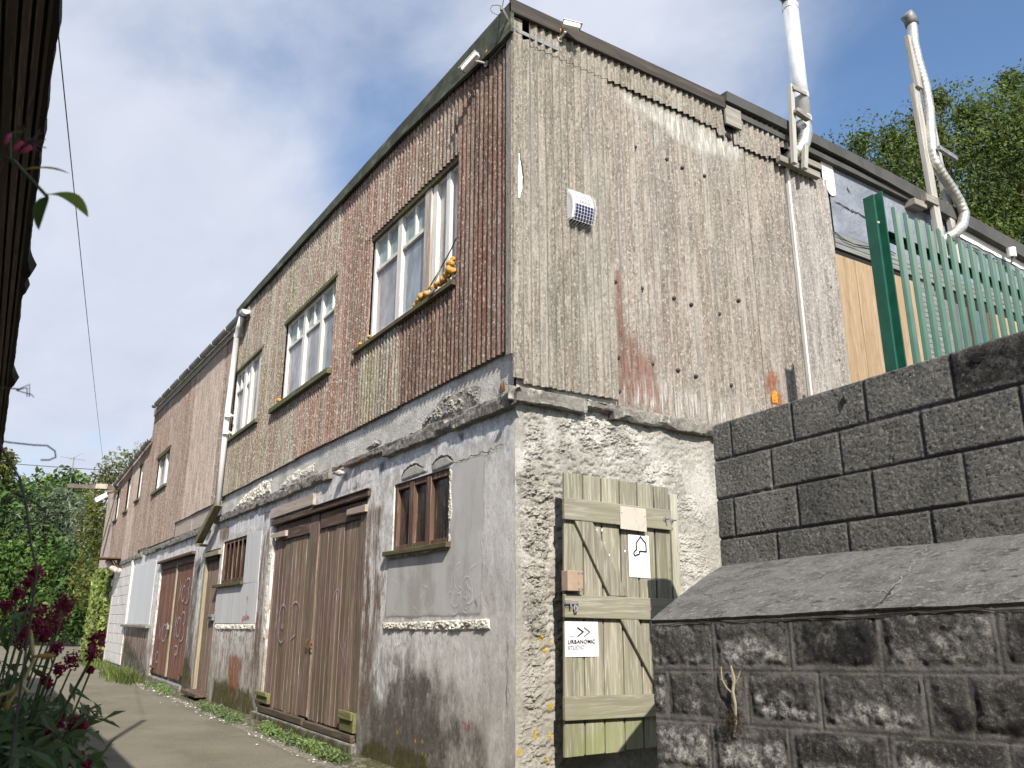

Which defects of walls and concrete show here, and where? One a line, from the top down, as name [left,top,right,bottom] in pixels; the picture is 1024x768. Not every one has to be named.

corrosion [617,271,662,411]
spalling [422,386,481,427]
corrosion [767,372,782,407]
spalling [234,461,318,509]
crack [875,544,929,605]
leakage [357,507,483,768]
corrosion [228,656,239,699]